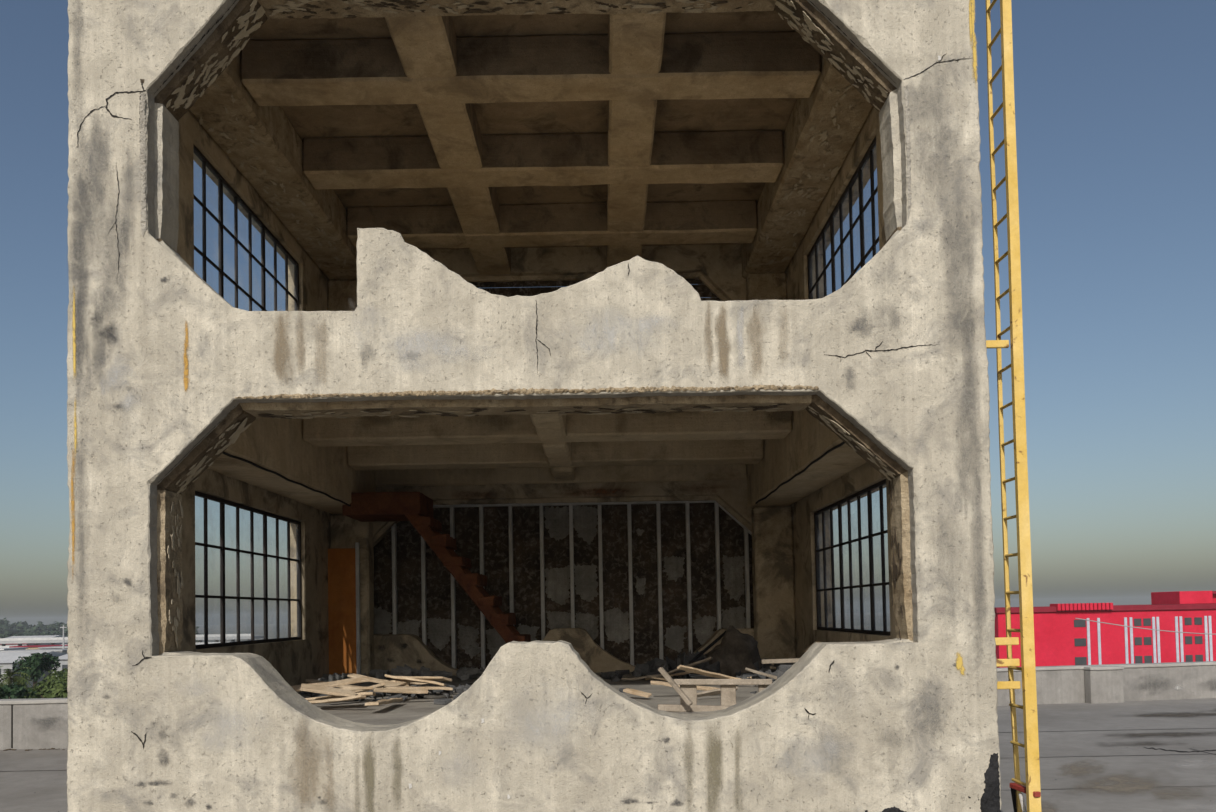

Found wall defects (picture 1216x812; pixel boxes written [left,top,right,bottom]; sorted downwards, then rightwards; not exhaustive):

crack [77,0,236,144]
peeling [166,0,571,111]
peeling [594,0,754,14]
peeling [775,0,888,111]
crack [809,0,970,83]
water stain [275,318,303,374]
crack [535,301,551,373]
water stain [707,310,760,374]
crack [824,341,937,358]
water stain [364,750,374,812]
water stain [708,739,721,809]
spalling [968,753,1001,812]